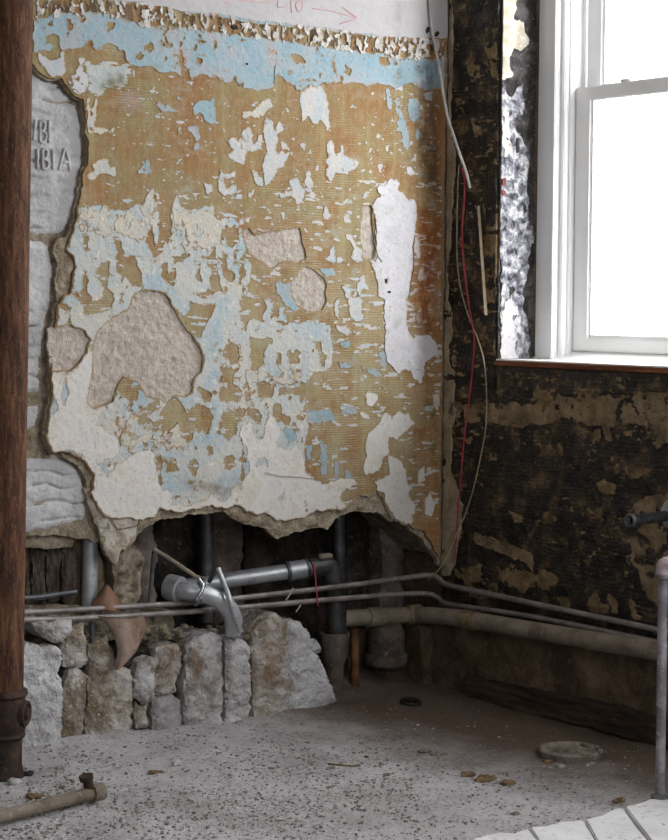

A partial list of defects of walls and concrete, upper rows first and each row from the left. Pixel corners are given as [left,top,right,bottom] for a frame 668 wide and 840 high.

peeling [26,0,668,605]